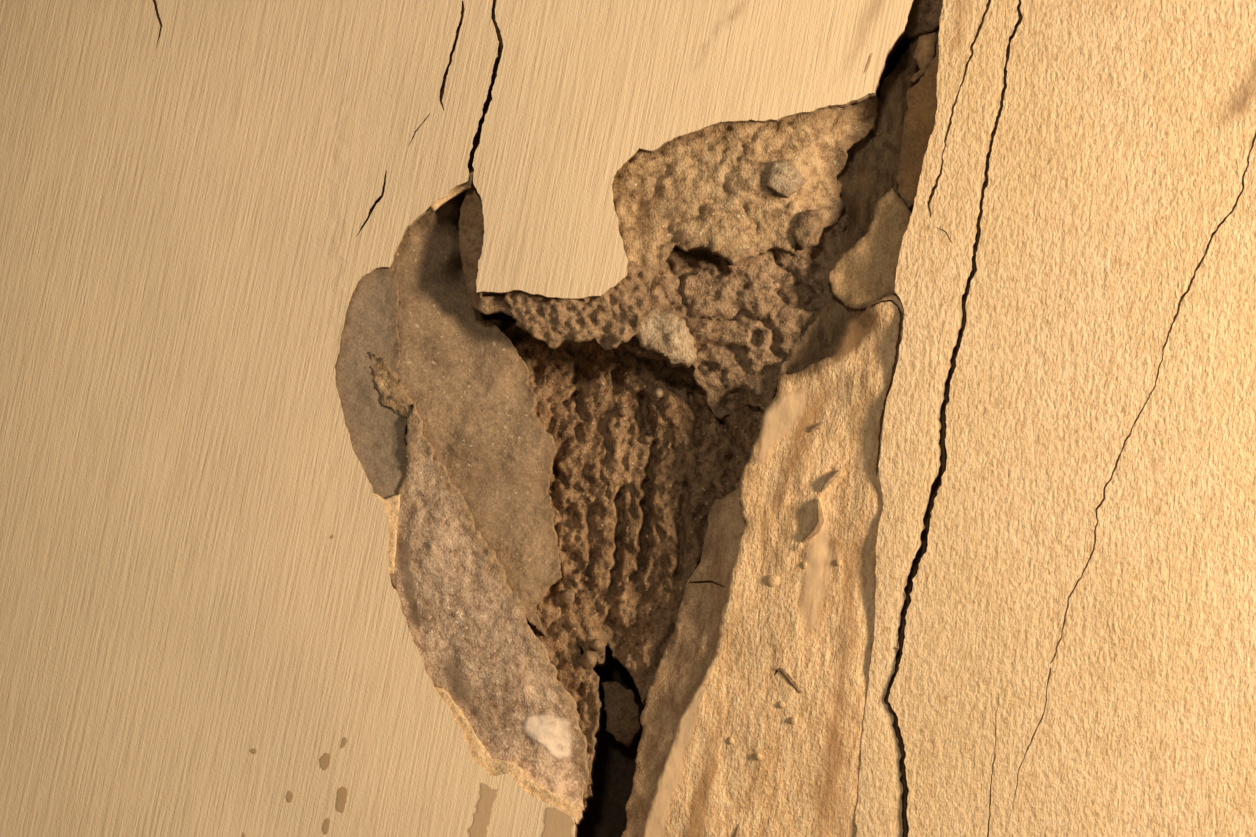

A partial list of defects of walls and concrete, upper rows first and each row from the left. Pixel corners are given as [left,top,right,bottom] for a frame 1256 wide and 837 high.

crack [153,0,162,52]
crack [409,0,503,188]
crack [356,171,387,237]
spalling [335,0,943,837]
crack [871,300,903,476]
crack [884,0,1023,837]
crack [987,132,1256,837]
peeling [320,737,347,770]
peeling [323,787,347,834]